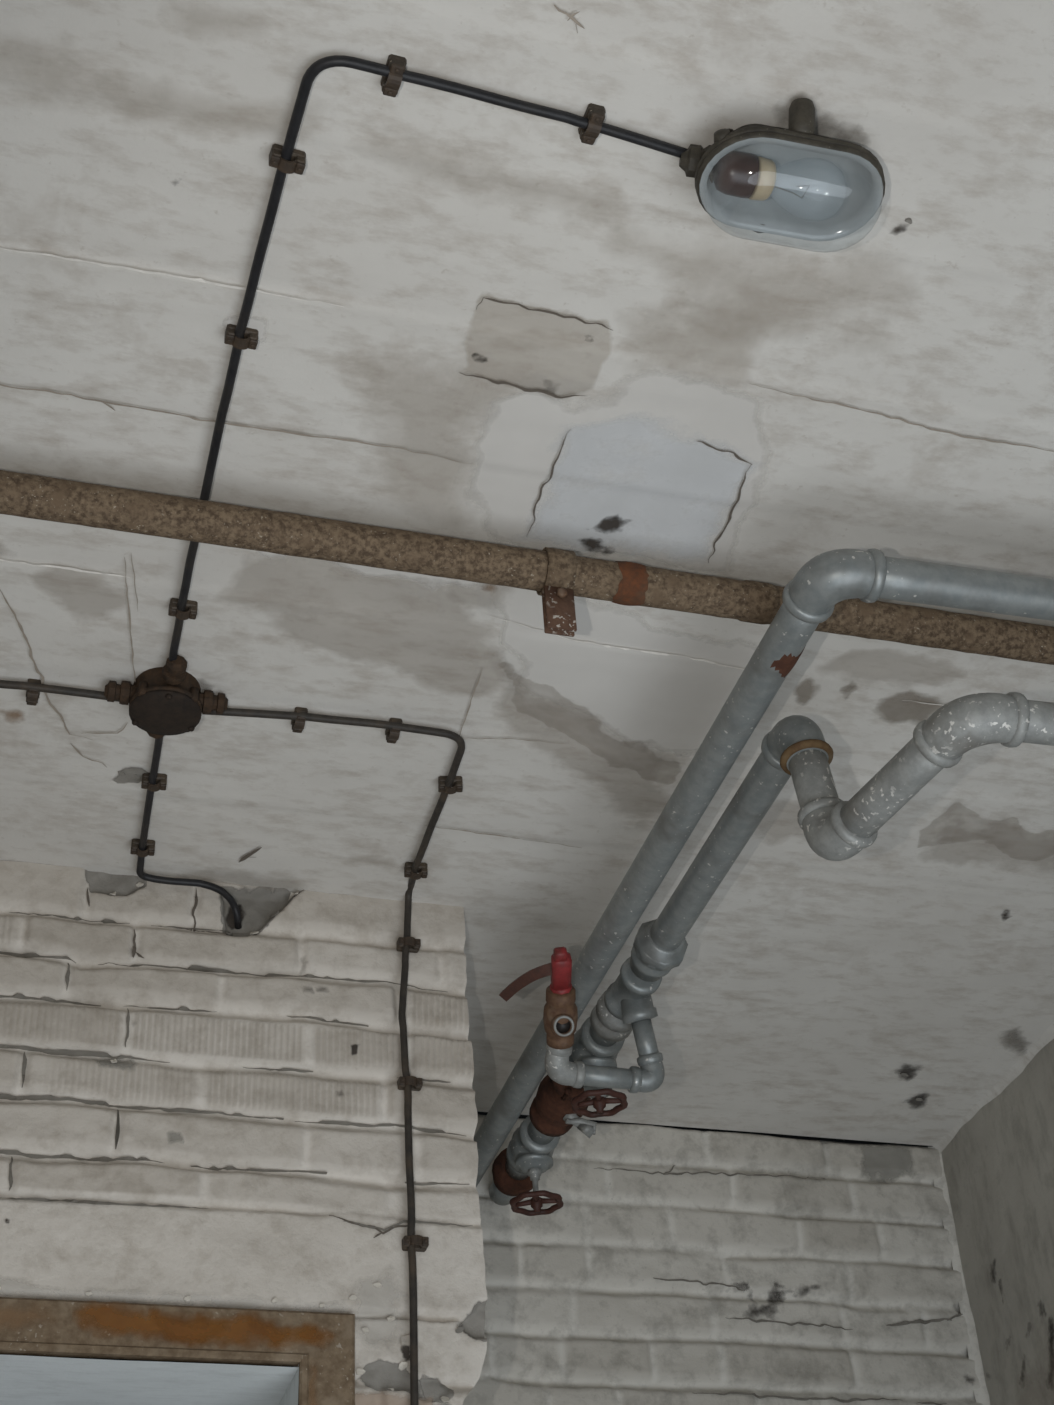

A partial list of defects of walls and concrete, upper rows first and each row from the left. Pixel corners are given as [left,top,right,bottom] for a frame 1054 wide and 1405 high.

crack [0,555,138,766]
spalling [220,886,303,937]
rust [79,1305,331,1346]
crack [654,1278,853,1330]
crack [886,1314,963,1326]
spalling [355,1346,454,1405]